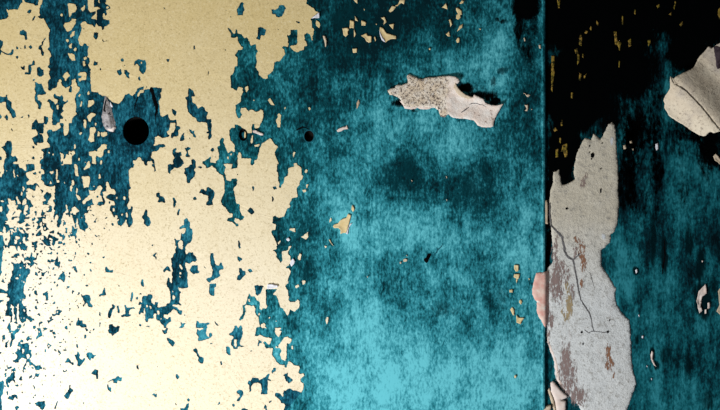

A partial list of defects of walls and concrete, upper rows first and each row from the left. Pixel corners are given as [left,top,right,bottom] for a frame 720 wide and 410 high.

flaking render [388,74,503,128]
peeling [663,43,720,136]
peeling [0,0,320,410]
crack [549,203,606,333]
flaking render [528,121,636,410]
peeling [697,284,720,314]